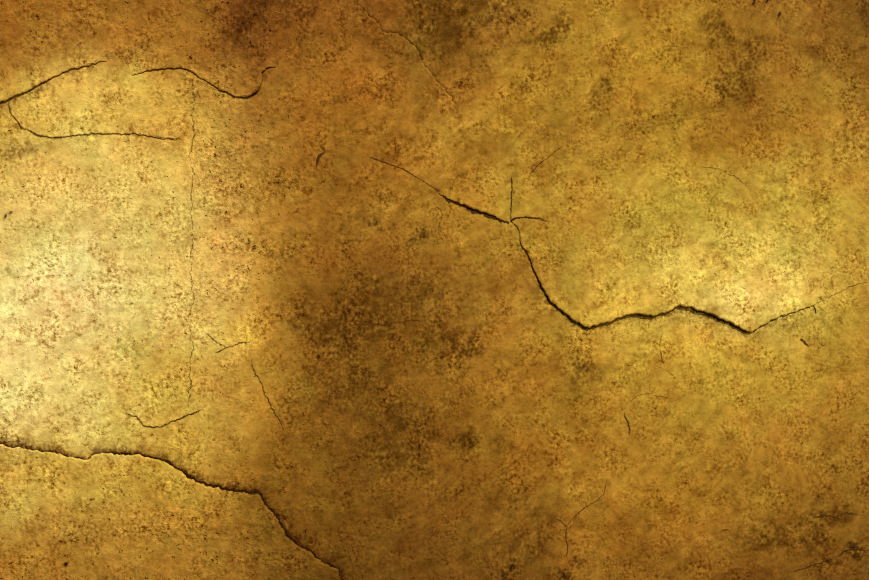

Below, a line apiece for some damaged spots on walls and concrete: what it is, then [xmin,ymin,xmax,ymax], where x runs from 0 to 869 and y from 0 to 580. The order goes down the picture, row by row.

crack [371,157,546,233]